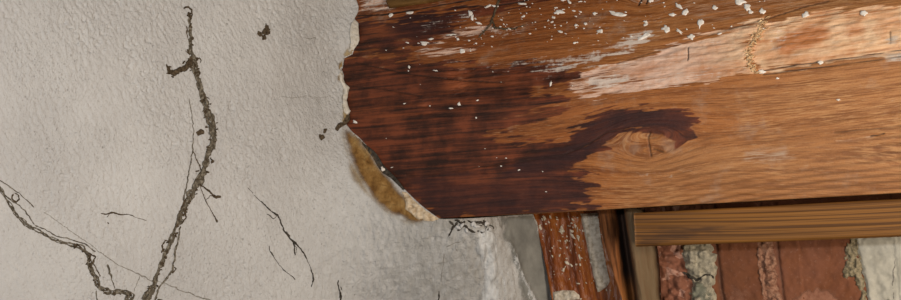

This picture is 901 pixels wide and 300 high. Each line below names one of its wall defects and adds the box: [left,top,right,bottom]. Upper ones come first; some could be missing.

peeling [349,20,360,51]
peeling [339,71,357,124]
crack [0,6,221,300]
spalling [402,192,438,221]
crack [248,188,314,287]